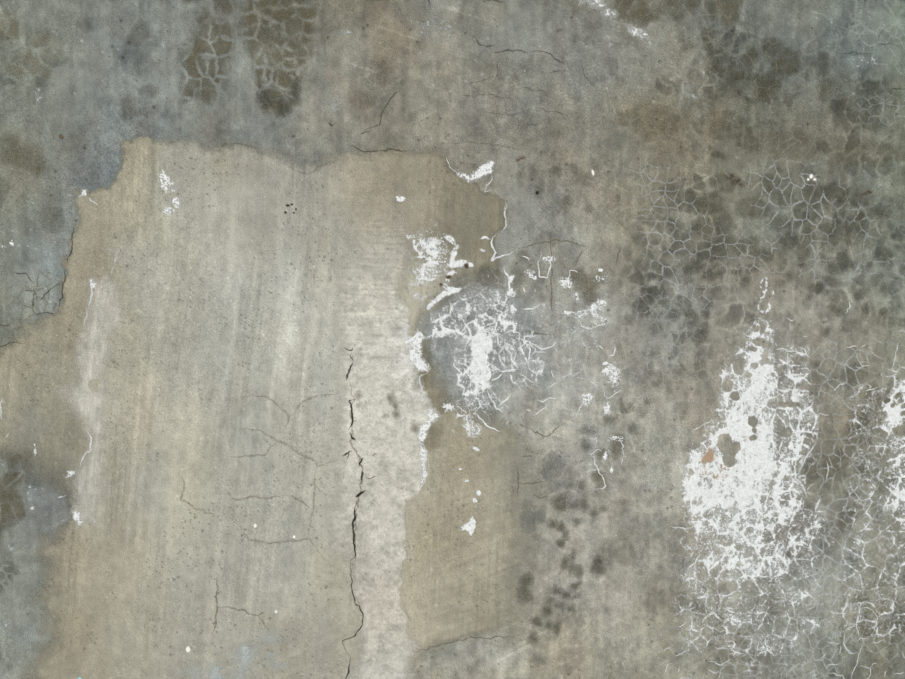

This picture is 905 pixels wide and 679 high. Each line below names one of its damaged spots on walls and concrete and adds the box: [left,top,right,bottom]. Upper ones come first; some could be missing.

water stain [185,16,231,96]
water stain [245,0,314,114]
water stain [586,0,655,38]
water stain [447,160,494,192]
crack [342,348,377,679]
peeling [331,174,438,679]
peeling [461,516,476,536]
water stain [404,231,611,487]
water stain [574,345,623,421]
water stain [583,436,624,489]
water stain [664,277,905,679]
crack [816,444,871,606]